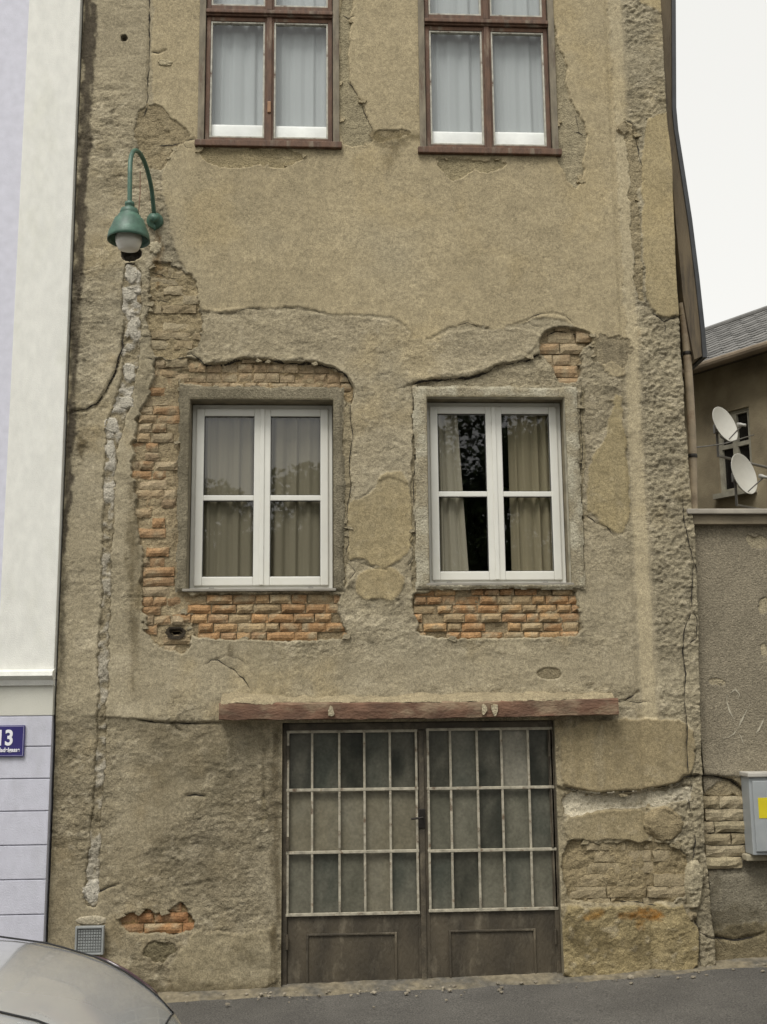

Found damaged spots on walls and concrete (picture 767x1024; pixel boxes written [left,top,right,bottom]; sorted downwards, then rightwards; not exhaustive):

water stain [62,0,97,553]
spalling [134,103,307,170]
spalling [624,121,644,302]
crack [74,335,159,411]
flaking render [131,260,354,654]
flaking render [407,436,583,642]
spalling [417,327,633,500]
flaking render [115,903,194,965]
spalling [561,836,687,905]
flaking render [562,783,746,869]